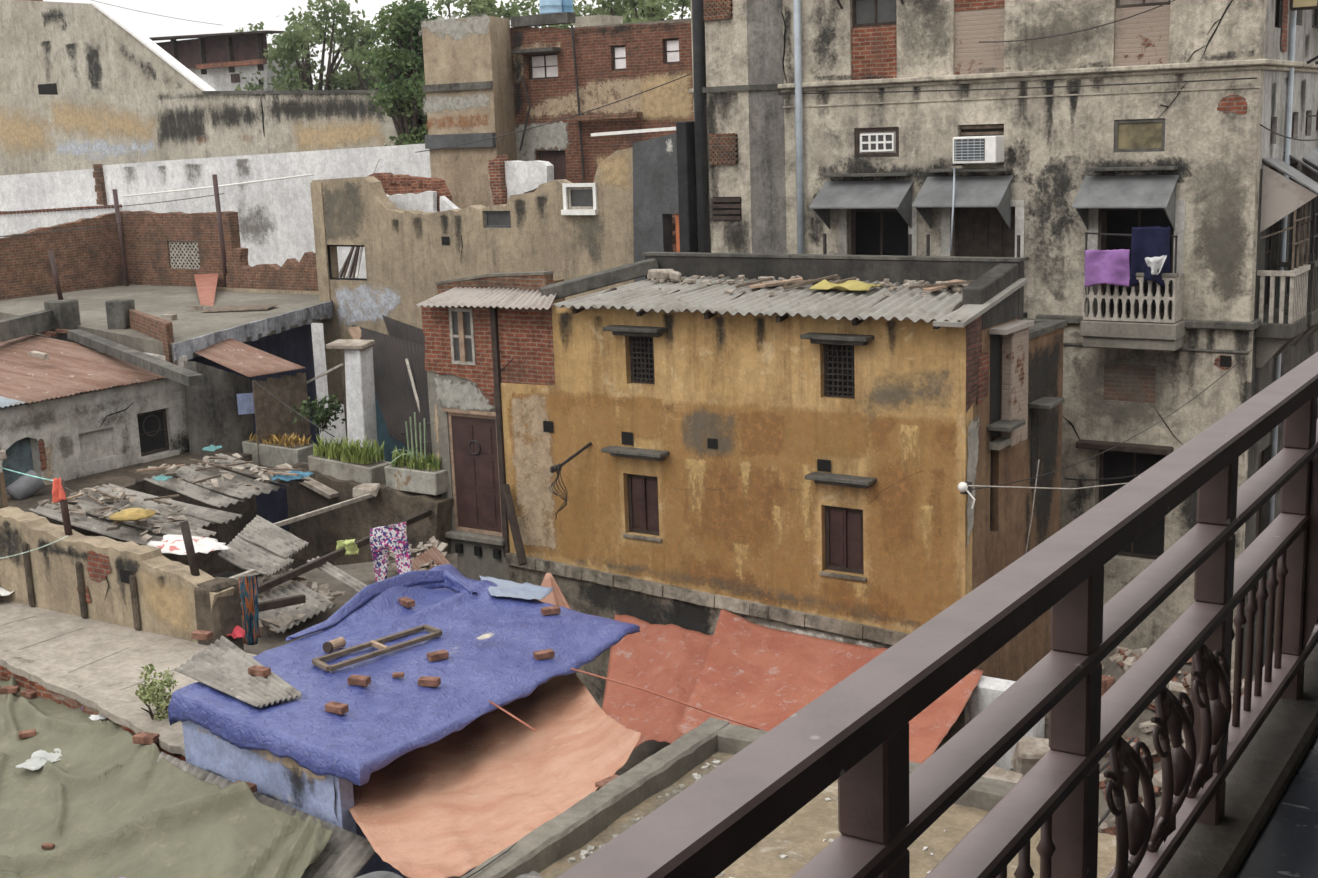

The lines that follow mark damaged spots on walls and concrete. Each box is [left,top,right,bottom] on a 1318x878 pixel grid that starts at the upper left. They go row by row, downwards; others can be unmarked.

water stain [41,10,102,89]
water stain [120,46,383,142]
spalling [1217,94,1247,114]
water stain [818,140,1245,300]
peeling [477,315,989,626]
spalling [77,550,112,603]